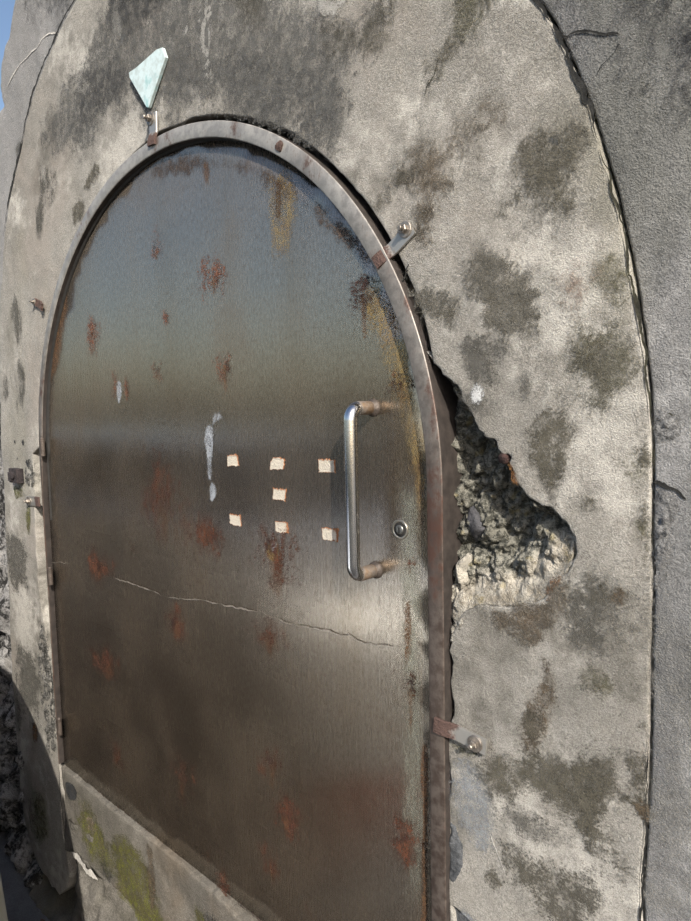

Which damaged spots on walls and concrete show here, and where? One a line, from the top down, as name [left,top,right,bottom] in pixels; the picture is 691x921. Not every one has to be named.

damp [41,0,394,164]
damp [36,170,57,235]
damp [72,201,84,225]
damp [83,164,100,189]
damp [498,119,591,223]
crack [533,0,673,433]
corrosion [248,523,307,588]
spalling [447,378,577,641]
corrosion [388,744,428,921]
peeling [454,906,473,921]